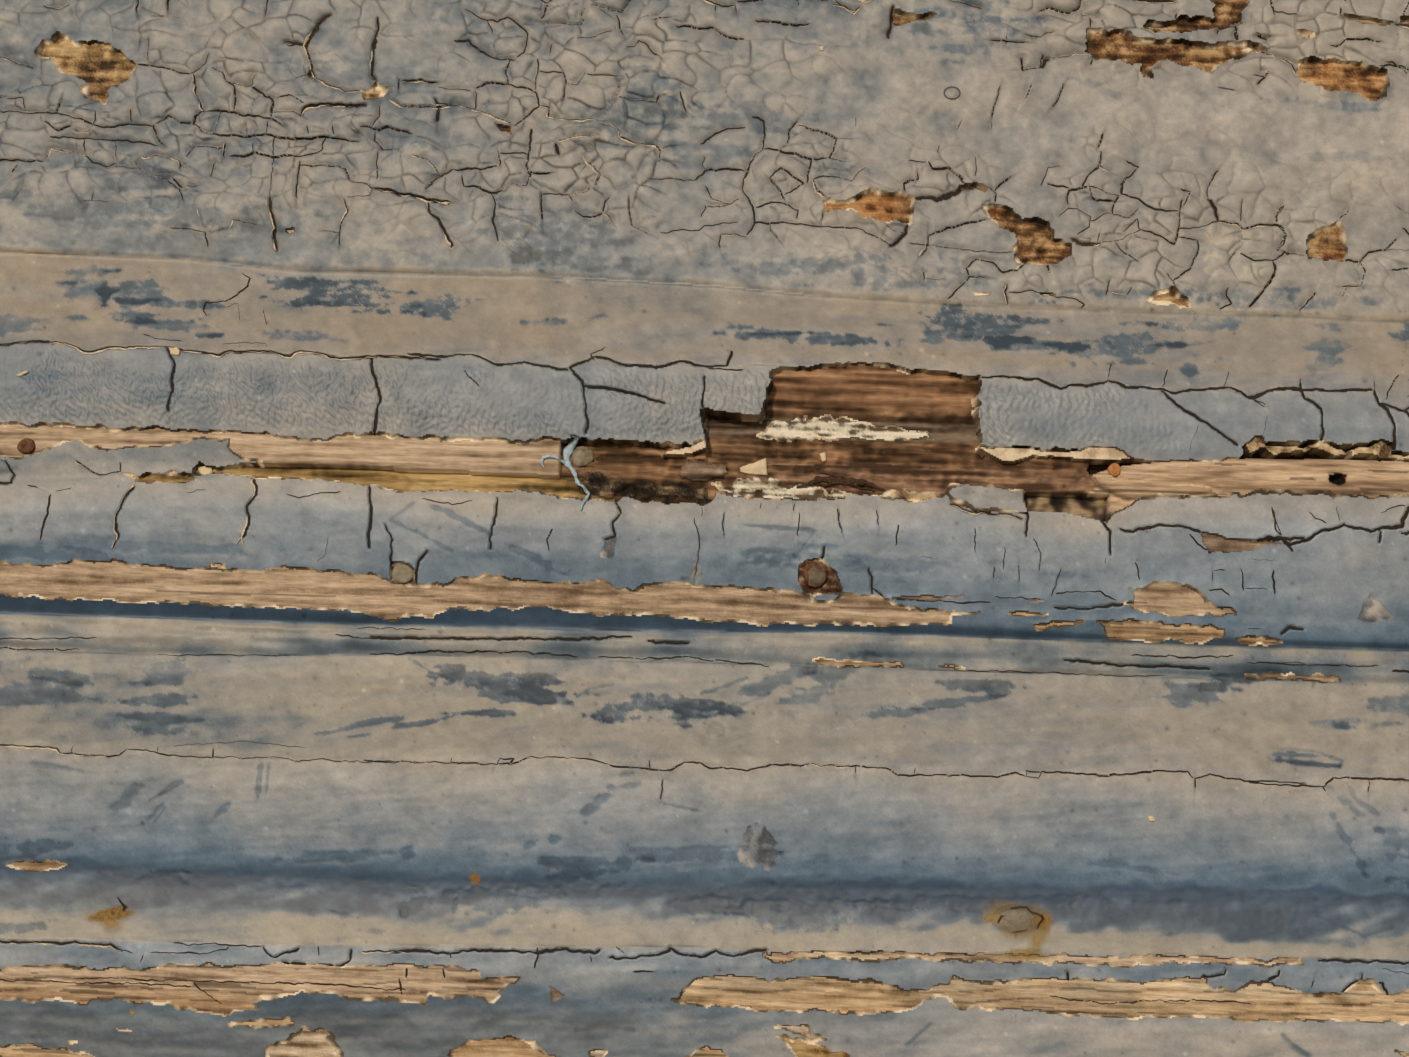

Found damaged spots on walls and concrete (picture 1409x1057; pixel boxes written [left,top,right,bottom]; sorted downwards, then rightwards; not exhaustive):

peeling [1085,0,1267,79]
crack [1217,0,1409,90]
crack [0,0,1349,309]
peeling [958,182,1072,265]
crack [1299,206,1409,311]
crack [0,273,743,442]
peeling [0,361,1409,523]
crack [975,364,1409,454]
peeling [0,558,981,627]
crack [0,741,1409,799]
peeling [0,961,521,1057]
peeling [671,950,1409,1057]